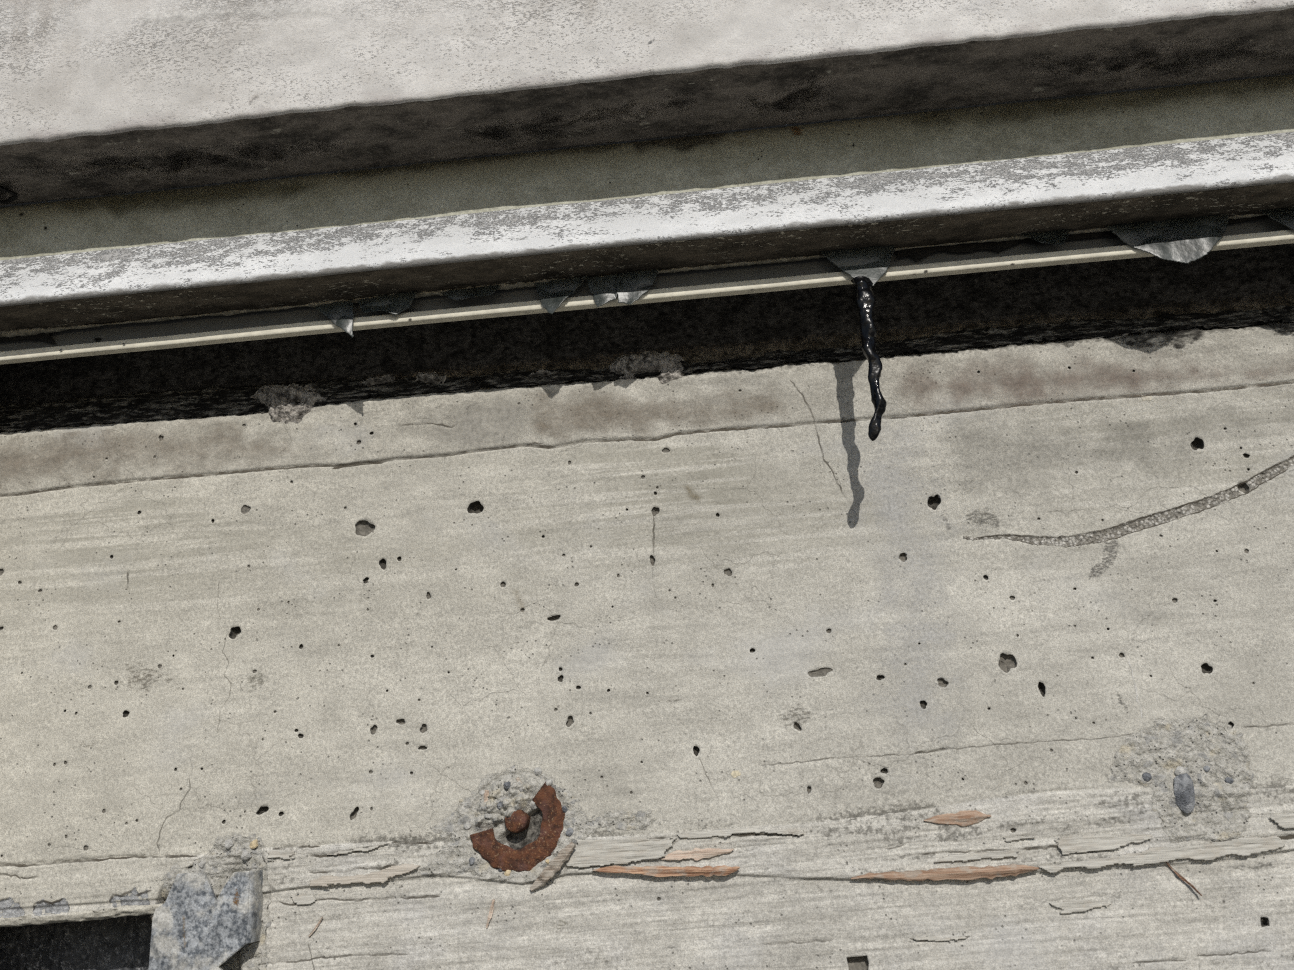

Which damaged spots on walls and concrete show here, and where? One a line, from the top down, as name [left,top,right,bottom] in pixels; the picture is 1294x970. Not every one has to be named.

crack [1,423,555,497]
crack [602,393,858,489]
crack [889,382,1294,419]
spalling [309,765,677,887]
spalling [1038,715,1294,873]
peeling [0,897,70,918]
spalling [109,833,271,970]